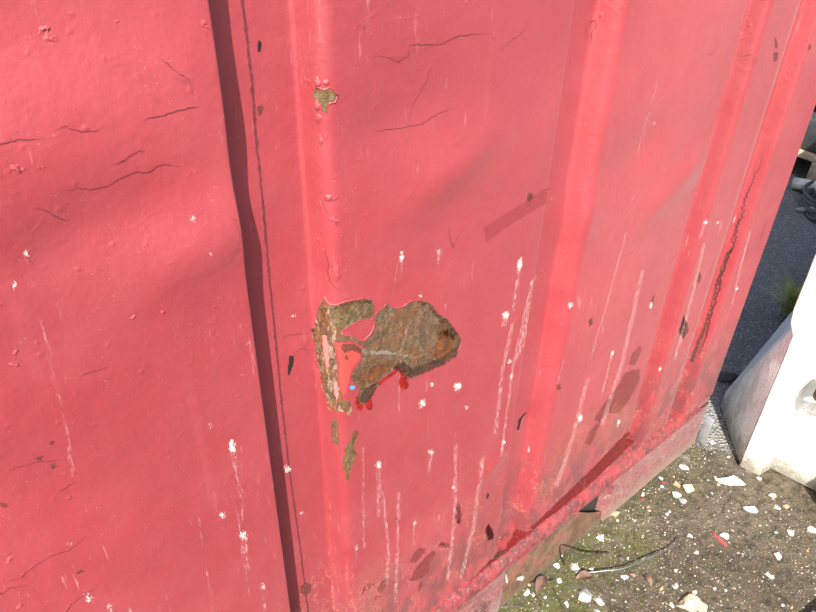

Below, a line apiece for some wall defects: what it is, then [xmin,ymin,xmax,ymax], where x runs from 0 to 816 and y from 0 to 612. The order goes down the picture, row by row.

crack [383,33,489,62]
peeling [313,76,339,124]
crack [0,126,100,144]
crack [65,150,174,191]
corrosion [309,296,461,480]
crack [1,538,84,595]